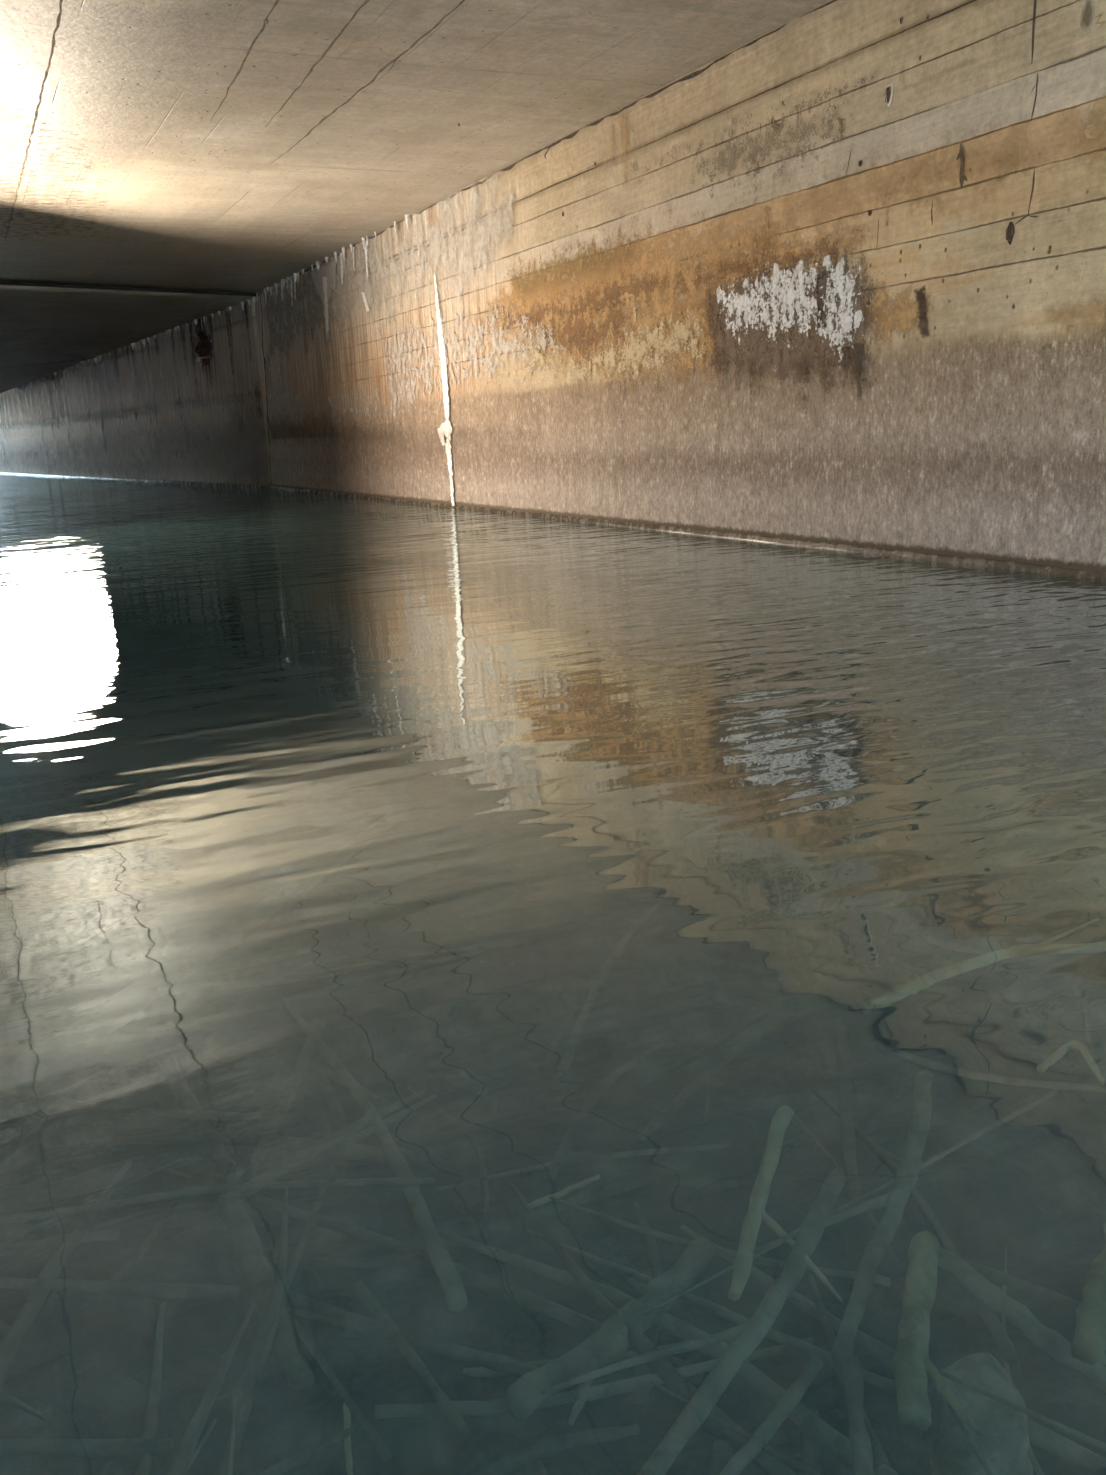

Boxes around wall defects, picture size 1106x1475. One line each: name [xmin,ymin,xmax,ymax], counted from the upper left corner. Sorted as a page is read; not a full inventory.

crack [5,0,63,240]
spalling [714,0,837,62]
crack [1030,0,1038,120]
leakage [0,180,513,506]
rust [475,208,863,393]
leakage [702,249,878,401]